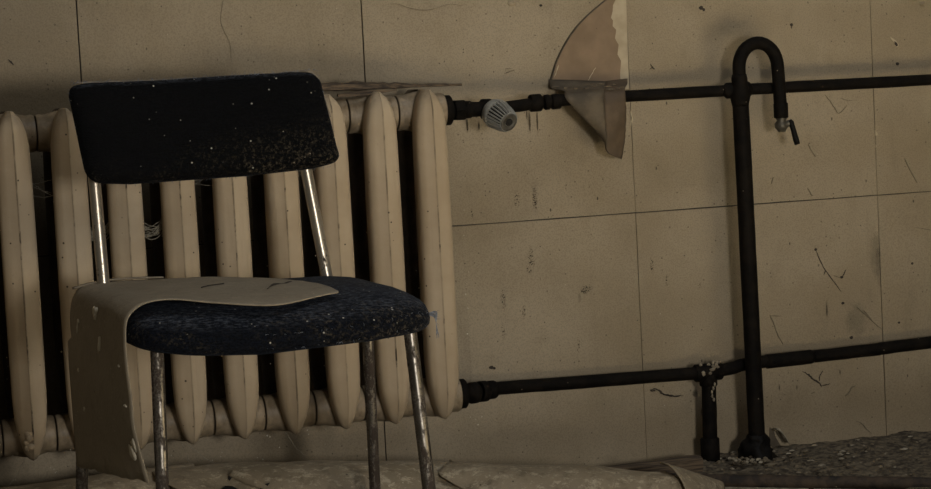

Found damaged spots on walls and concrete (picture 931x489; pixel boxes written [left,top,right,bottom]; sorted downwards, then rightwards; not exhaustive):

flaking render [611,0,629,89]